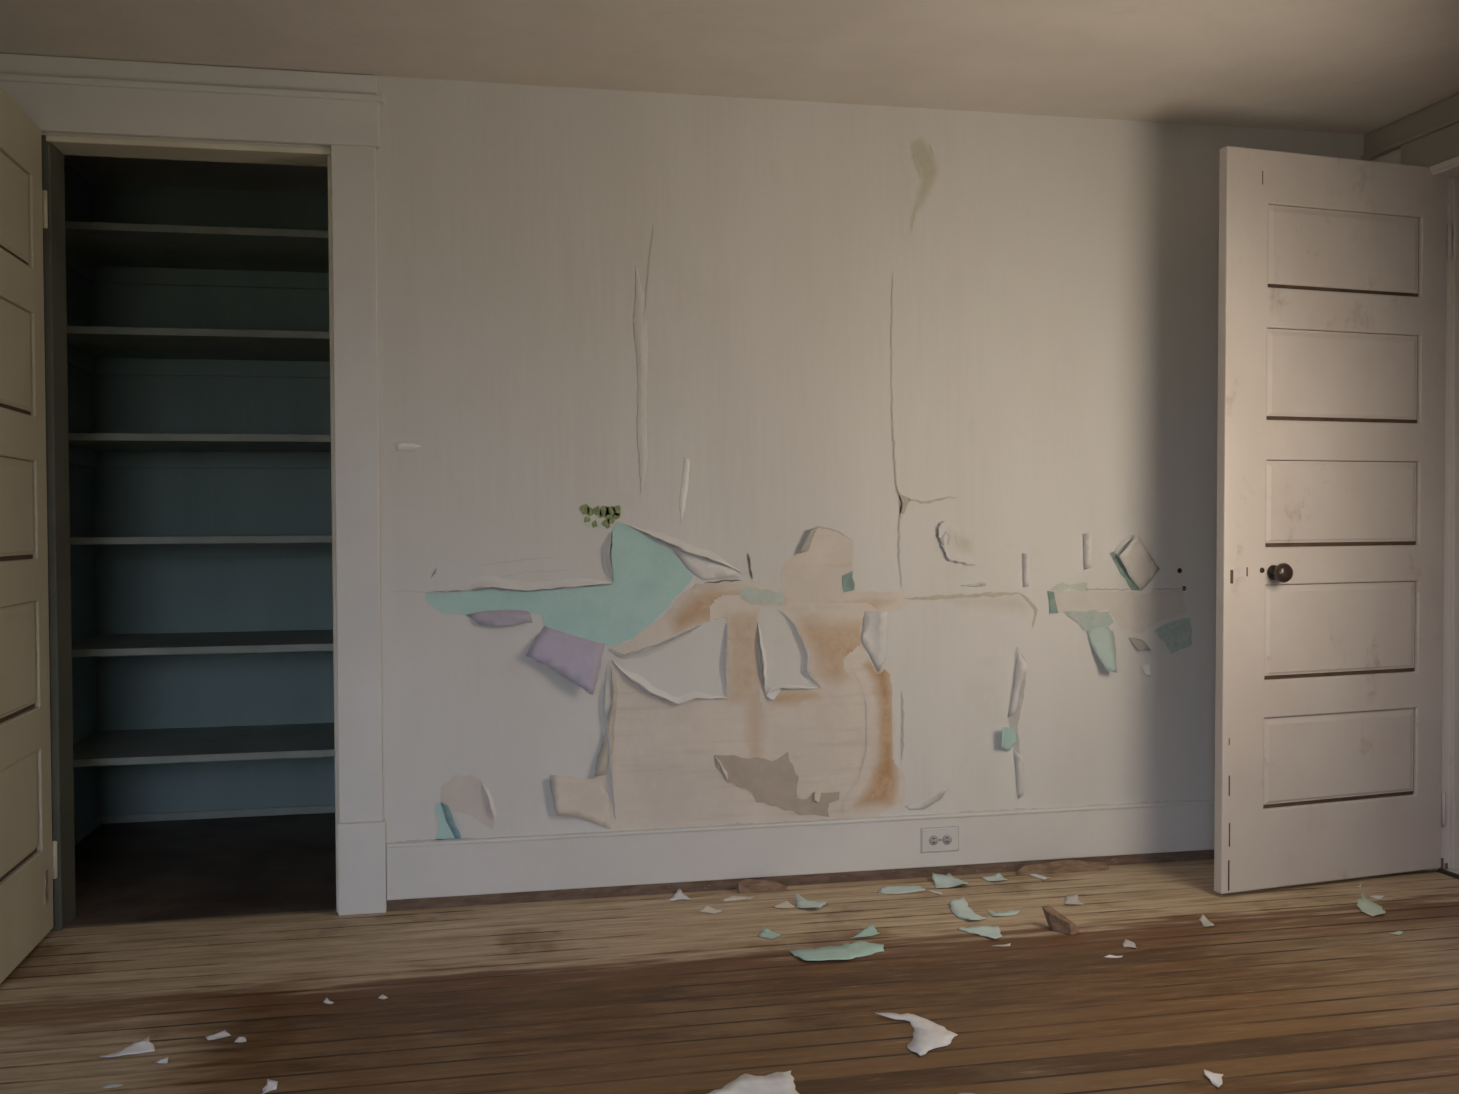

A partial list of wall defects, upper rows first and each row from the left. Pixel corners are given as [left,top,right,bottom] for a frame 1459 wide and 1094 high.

flaking render [427,521,947,840]
water stain [656,582,908,818]
peeling [1001,648,1028,799]
peeling [1022,553,1030,587]
peeling [1047,533,1192,677]